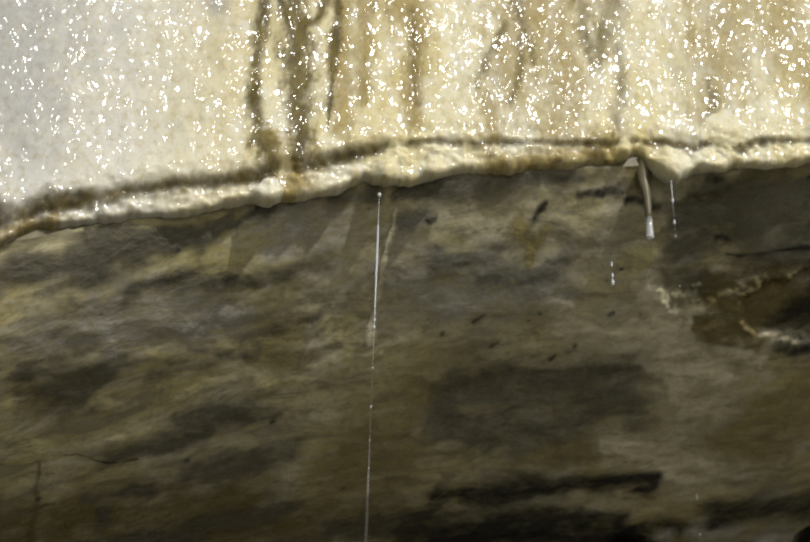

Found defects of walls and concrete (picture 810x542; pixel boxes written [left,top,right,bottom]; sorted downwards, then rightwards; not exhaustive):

water stain [0,0,810,414]
water stain [0,178,810,542]
crack [715,235,810,257]